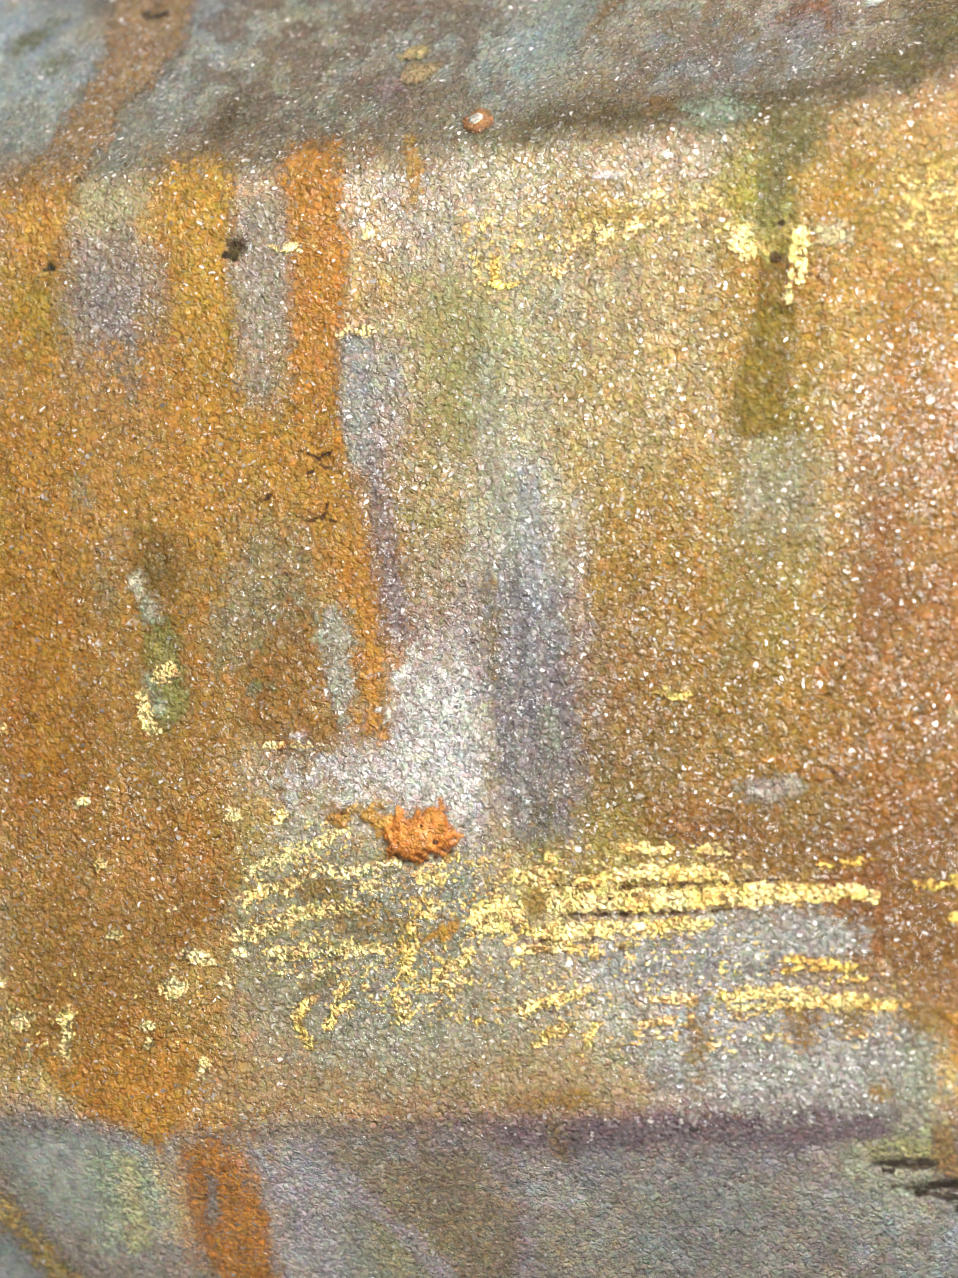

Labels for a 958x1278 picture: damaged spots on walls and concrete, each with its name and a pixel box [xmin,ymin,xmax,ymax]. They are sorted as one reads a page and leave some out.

water stain [515,0,958,439]
rust [0,0,397,796]
rust [867,265,944,465]
rust [755,753,859,785]
peeling [5,949,227,1073]
peeling [225,820,911,1065]
rust [641,804,958,1024]
rust [36,1041,655,1278]